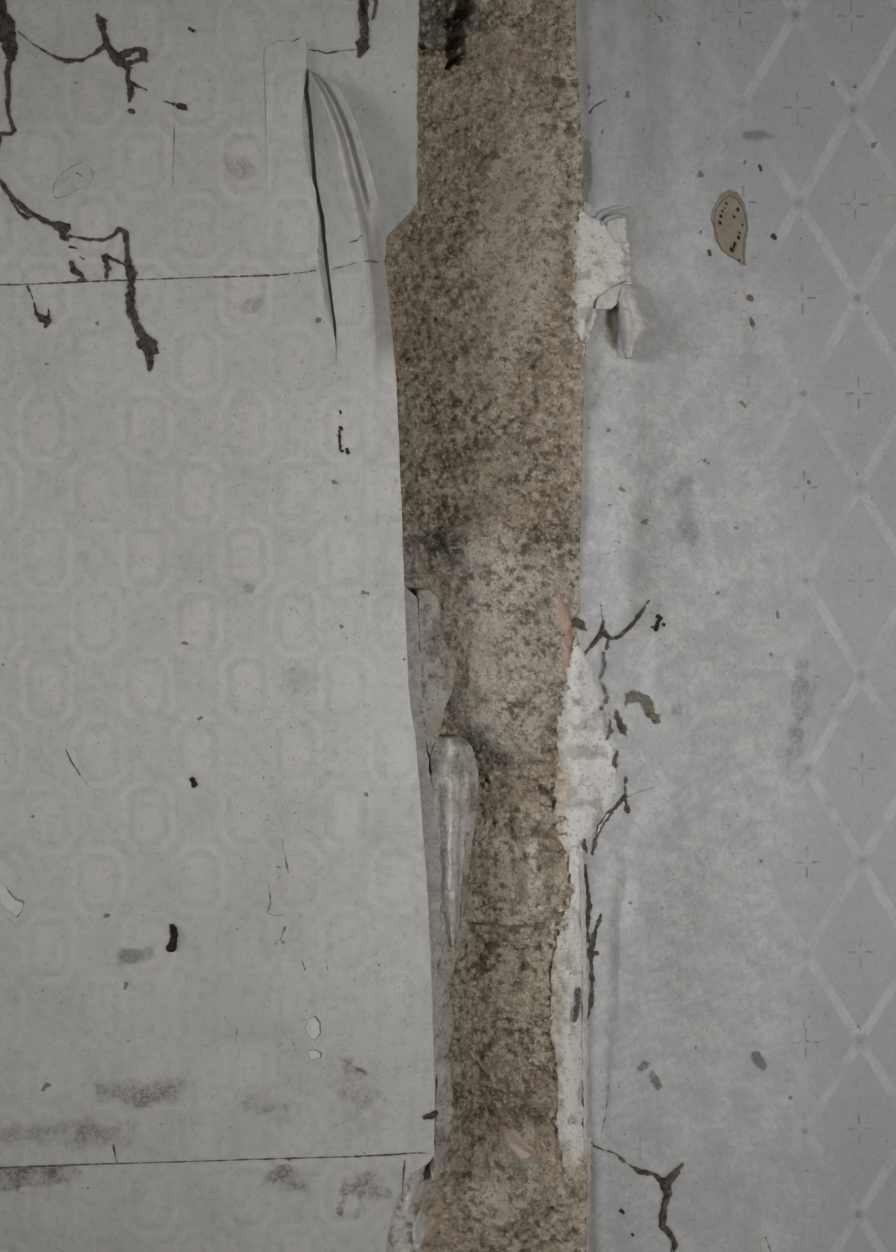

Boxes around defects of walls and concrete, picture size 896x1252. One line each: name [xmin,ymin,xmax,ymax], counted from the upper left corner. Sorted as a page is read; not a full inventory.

crack [0,0,148,146]
crack [309,0,378,58]
crack [0,179,378,372]
flaking render [384,0,648,1252]
crack [571,600,650,656]
crack [572,794,630,1033]
crack [581,1075,683,1252]